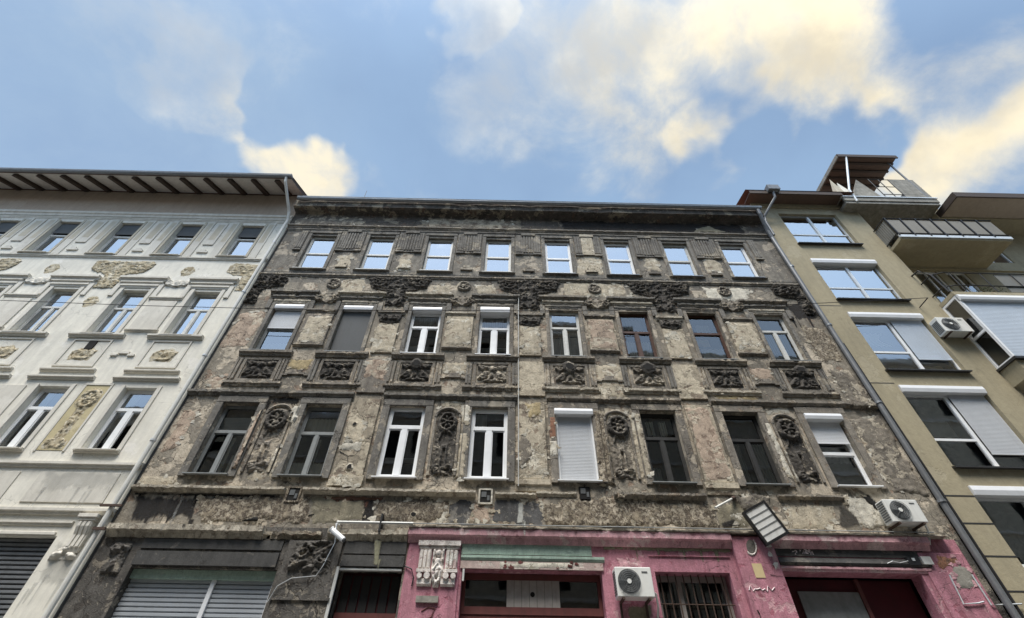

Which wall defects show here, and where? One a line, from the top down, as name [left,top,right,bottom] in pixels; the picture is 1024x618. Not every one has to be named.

peeling [136,474,179,486]
peeling [160,409,202,452]
flaking render [196,409,510,525]
peeling [521,406,561,479]
flaking render [538,364,749,529]
flaking render [801,325,930,497]
peeling [936,554,981,590]